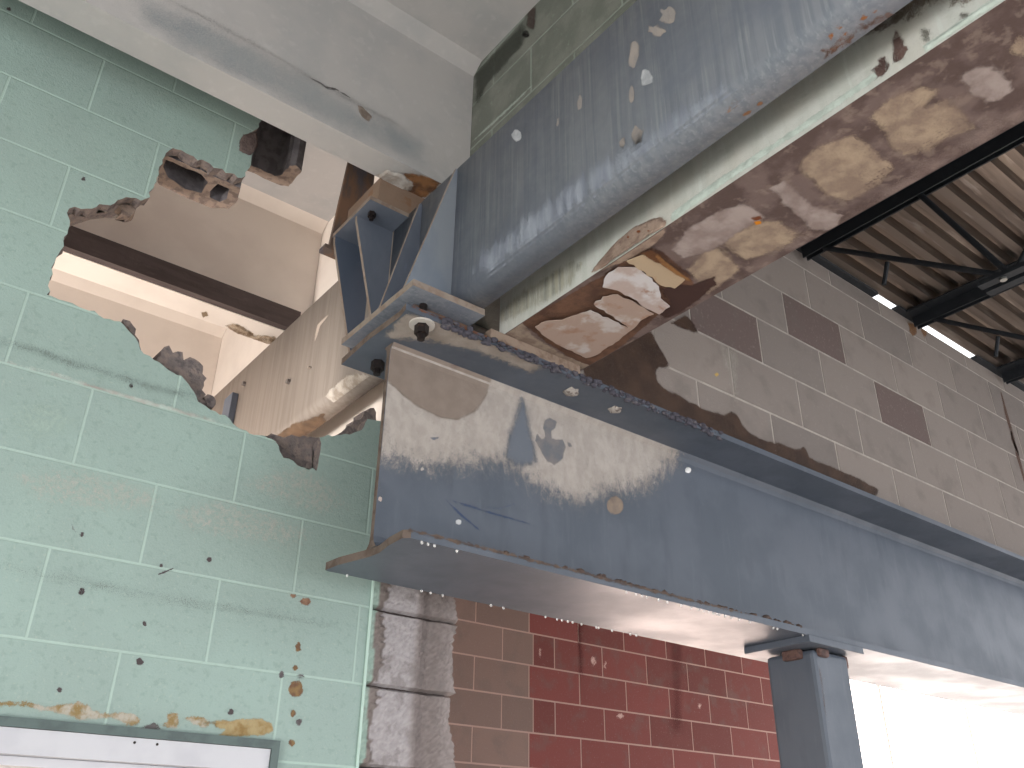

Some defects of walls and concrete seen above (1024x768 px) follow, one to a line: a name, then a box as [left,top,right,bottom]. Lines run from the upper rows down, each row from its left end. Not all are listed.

peeling [923,0,1004,52]
spalling [239,132,258,155]
peeling [507,30,908,369]
spalling [121,319,141,350]
spalling [227,323,276,344]
spalling [152,346,206,406]
damp [380,313,684,522]
spalling [265,433,319,469]
peeling [0,699,273,737]